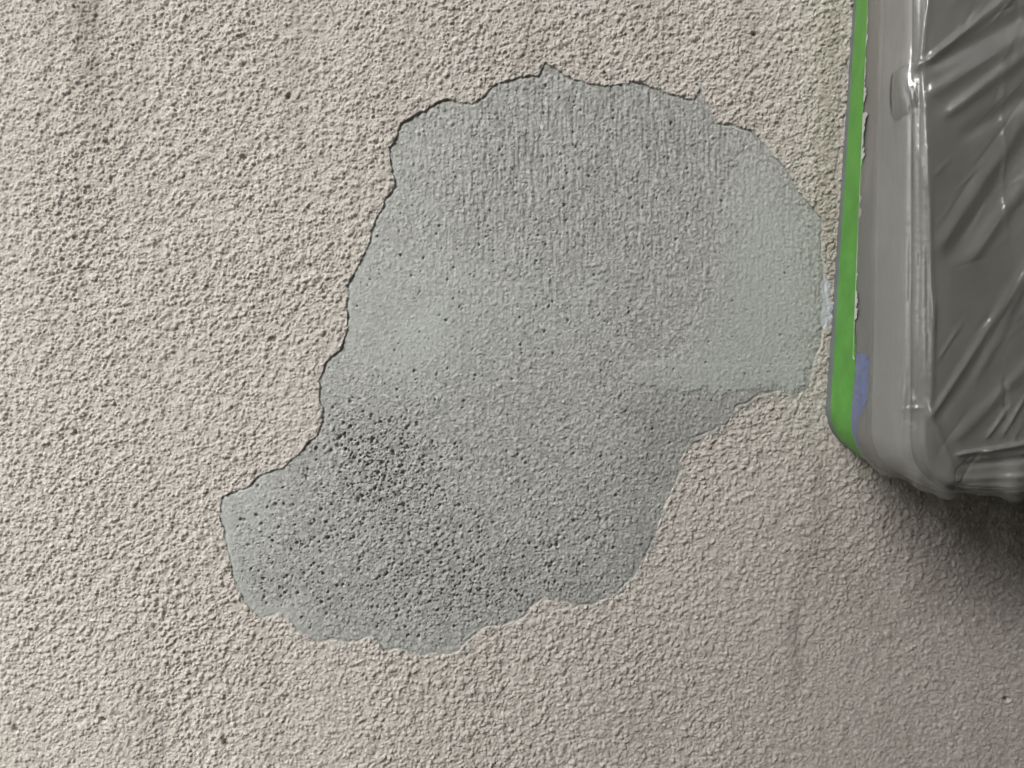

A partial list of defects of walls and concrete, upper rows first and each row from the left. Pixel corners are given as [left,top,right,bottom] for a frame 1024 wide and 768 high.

peeling [218,63,833,657]